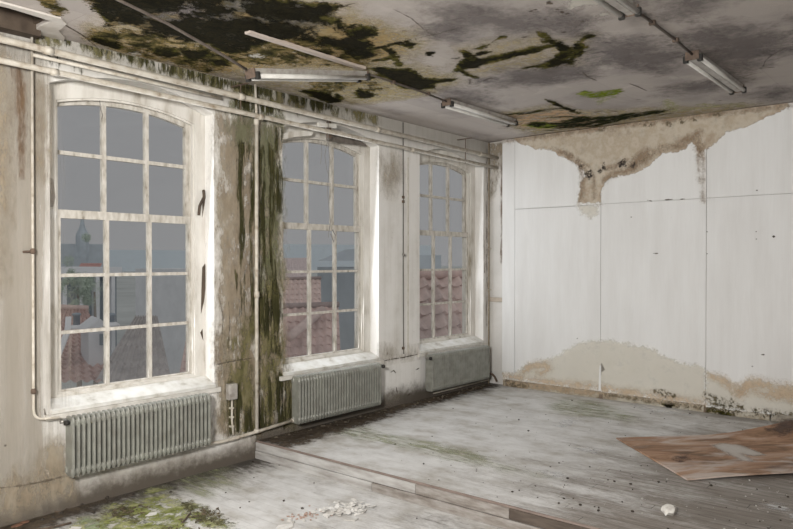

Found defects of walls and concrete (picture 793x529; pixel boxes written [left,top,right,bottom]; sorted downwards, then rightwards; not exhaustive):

leakage [0,56,25,215]
leakage [35,36,378,435]
leakage [507,103,789,217]
leakage [503,341,793,434]